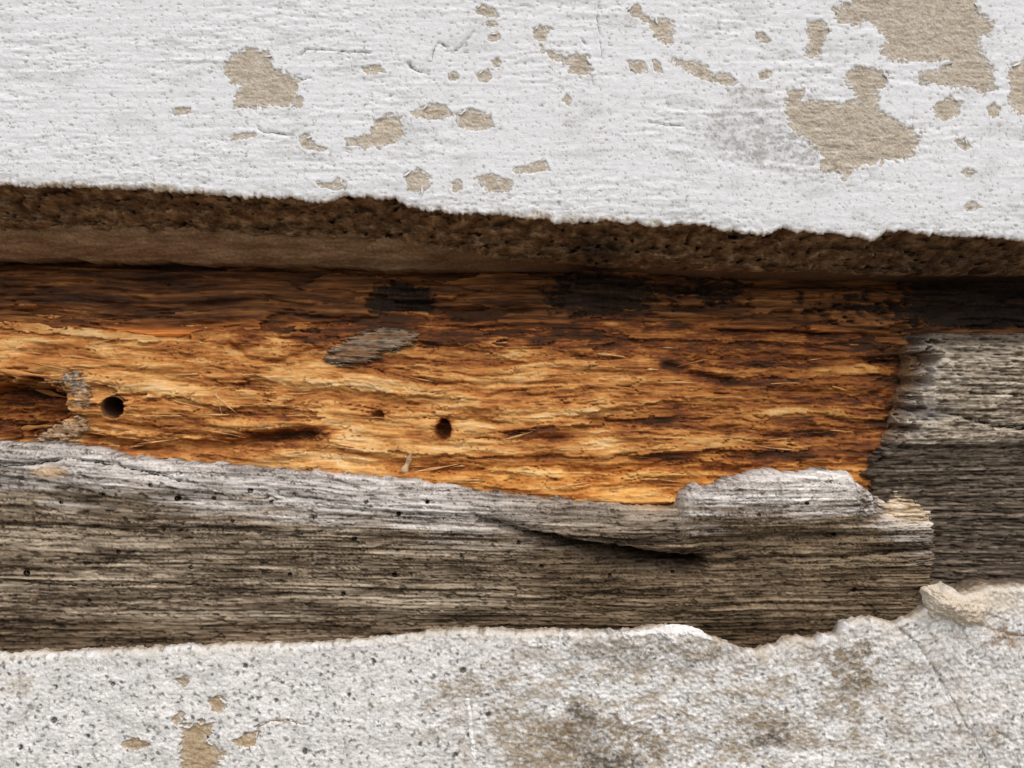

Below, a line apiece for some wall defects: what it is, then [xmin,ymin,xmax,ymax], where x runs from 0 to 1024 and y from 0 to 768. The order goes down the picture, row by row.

peeling [224,48,303,110]
peeling [627,0,1024,183]
peeling [344,104,495,150]
peeling [624,624,712,645]
peeling [122,738,150,752]
peeling [172,695,261,768]